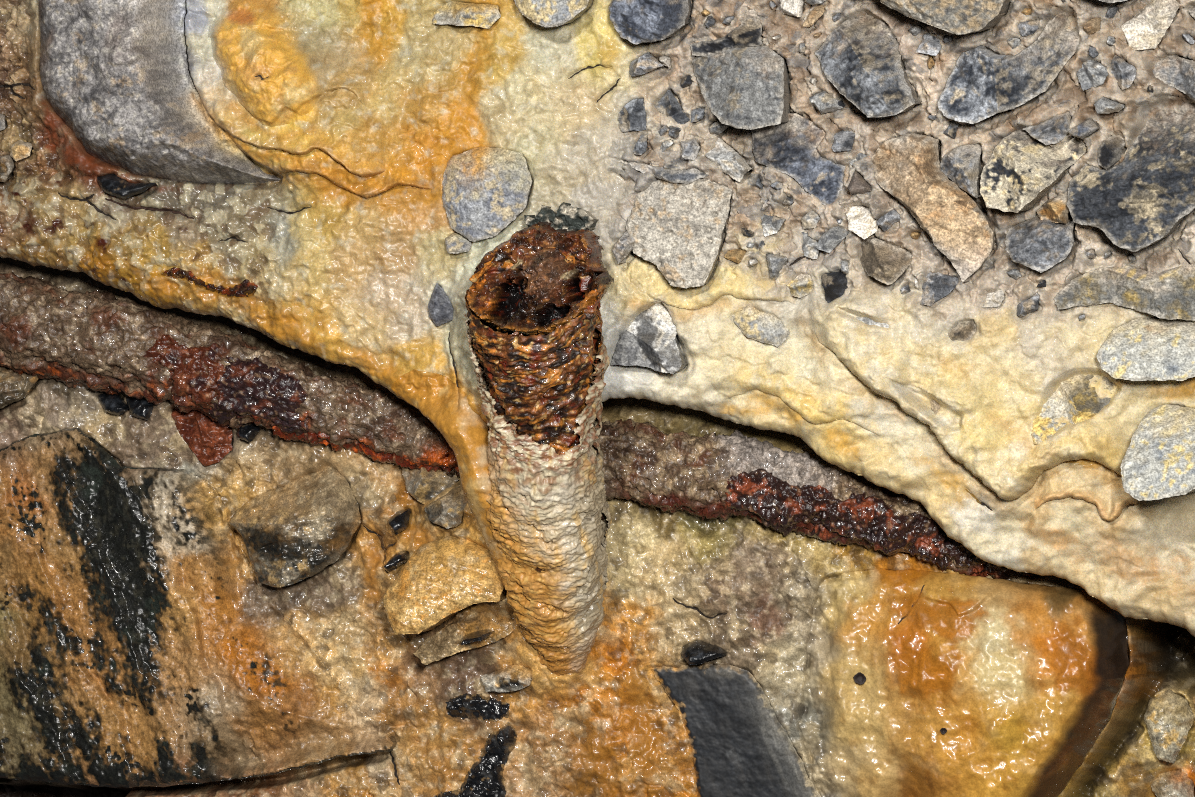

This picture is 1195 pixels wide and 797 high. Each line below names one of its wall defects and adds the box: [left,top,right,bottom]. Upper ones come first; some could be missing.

spalling [769,0,841,53]
spalling [1076,6,1136,114]
spalling [618,75,730,155]
spalling [724,179,793,279]
spalling [801,130,901,303]
rust [161,267,258,298]
spalling [900,272,958,306]
spalling [982,269,1046,318]
rust [0,272,460,476]
spalling [464,202,614,677]
rust [597,418,1046,579]
crack [389,752,400,785]